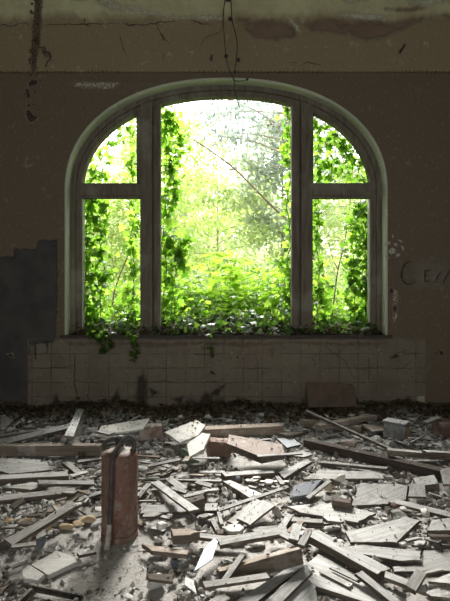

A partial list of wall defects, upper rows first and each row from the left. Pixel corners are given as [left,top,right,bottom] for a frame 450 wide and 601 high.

crack [48,19,174,60]